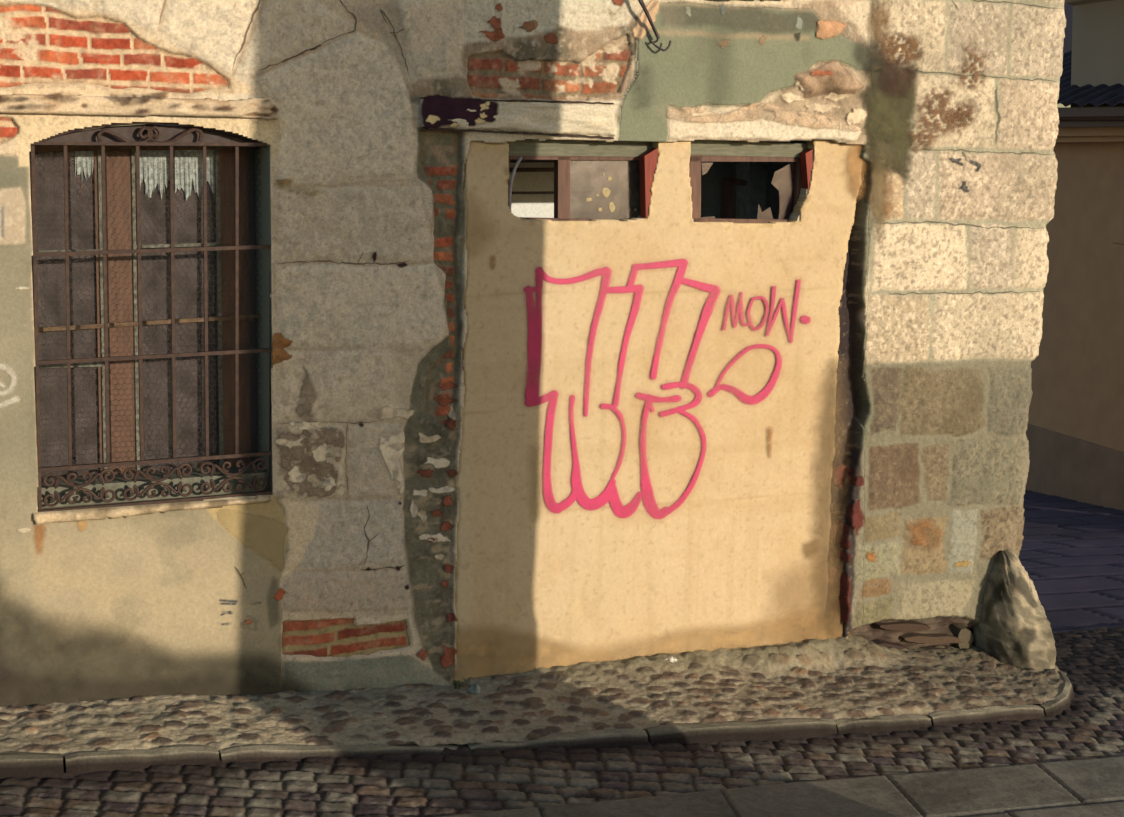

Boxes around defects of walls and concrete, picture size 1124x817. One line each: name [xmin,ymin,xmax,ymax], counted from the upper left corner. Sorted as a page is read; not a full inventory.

flaking render [0,4,229,94]